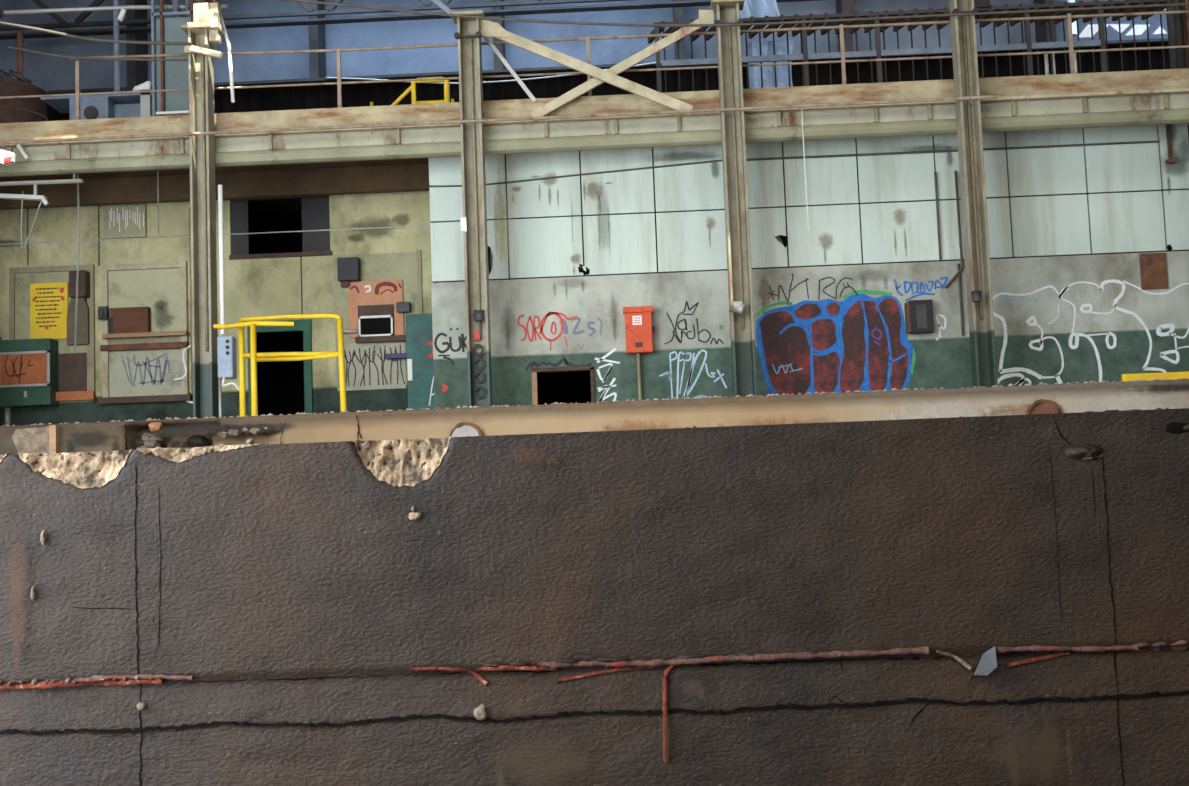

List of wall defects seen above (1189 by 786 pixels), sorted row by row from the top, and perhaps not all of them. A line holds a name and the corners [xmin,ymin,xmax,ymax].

spalling [0,422,278,489]
spalling [353,436,452,487]
spalling [408,506,422,520]
crack [0,416,1189,786]